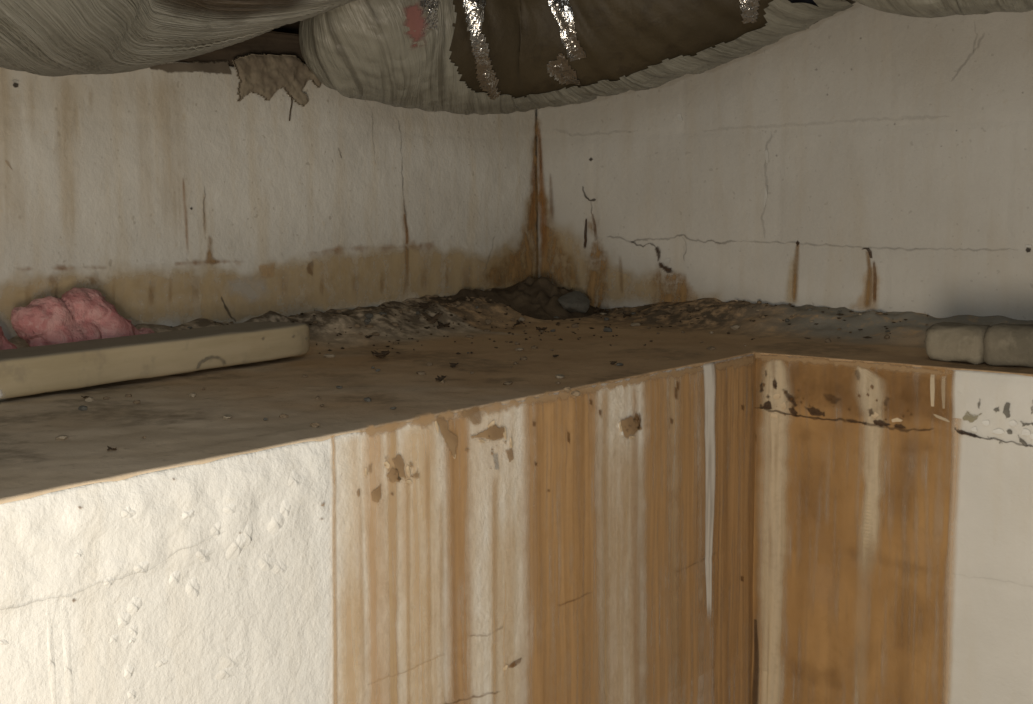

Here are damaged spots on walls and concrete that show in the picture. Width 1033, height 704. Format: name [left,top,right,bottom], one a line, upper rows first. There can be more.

rust [489,128,687,308]
damp [0,248,532,322]
rust [863,248,876,305]
spalling [761,380,912,429]
peeling [956,402,1033,447]
damp [366,352,957,704]